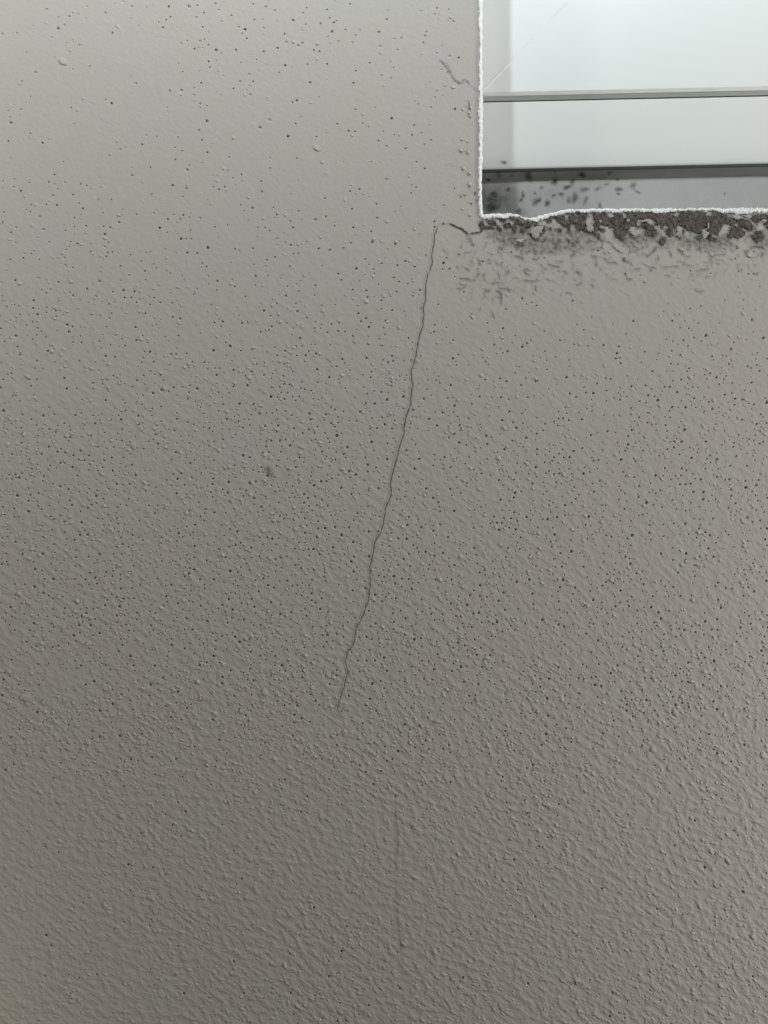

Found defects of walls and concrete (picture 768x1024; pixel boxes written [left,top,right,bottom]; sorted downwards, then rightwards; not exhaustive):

crack [337,223,684,710]